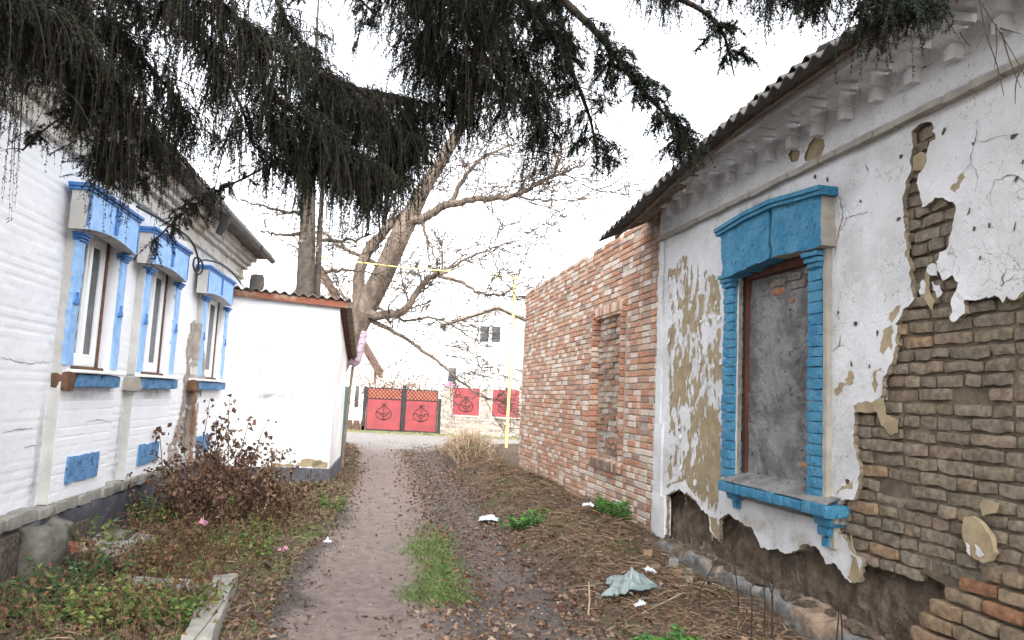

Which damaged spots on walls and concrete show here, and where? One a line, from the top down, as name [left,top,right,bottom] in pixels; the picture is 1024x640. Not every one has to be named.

crack [967,129,1024,206]
peeling [167,320,206,464]
spalling [663,122,1024,640]